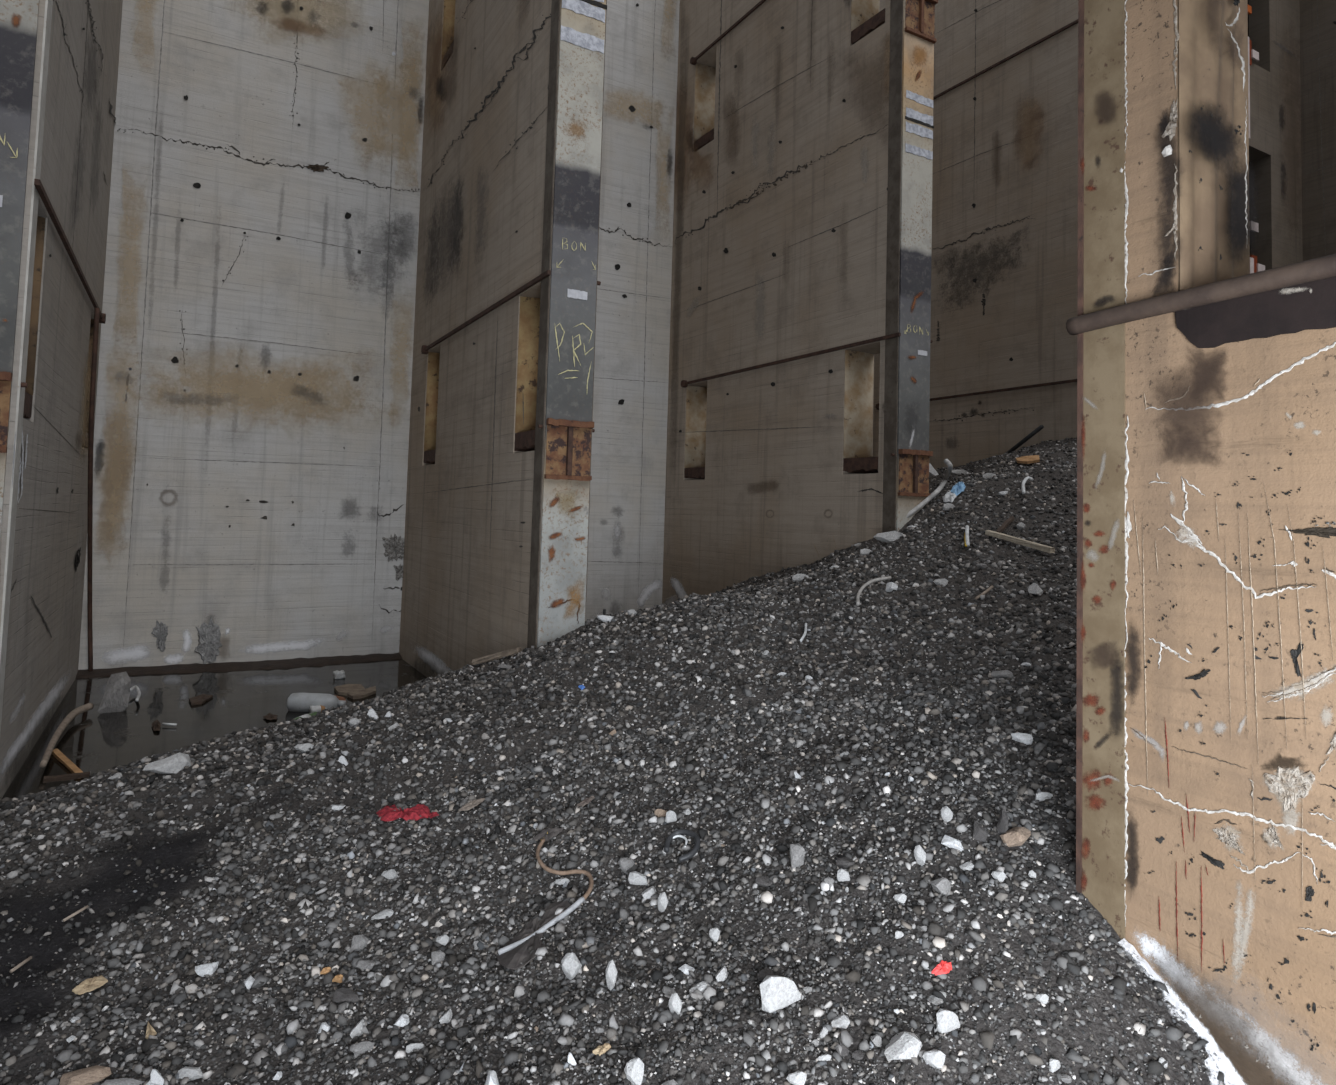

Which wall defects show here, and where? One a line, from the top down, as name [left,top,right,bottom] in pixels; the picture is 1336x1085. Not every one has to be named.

crack [53,0,551,192]
crack [599,124,889,247]